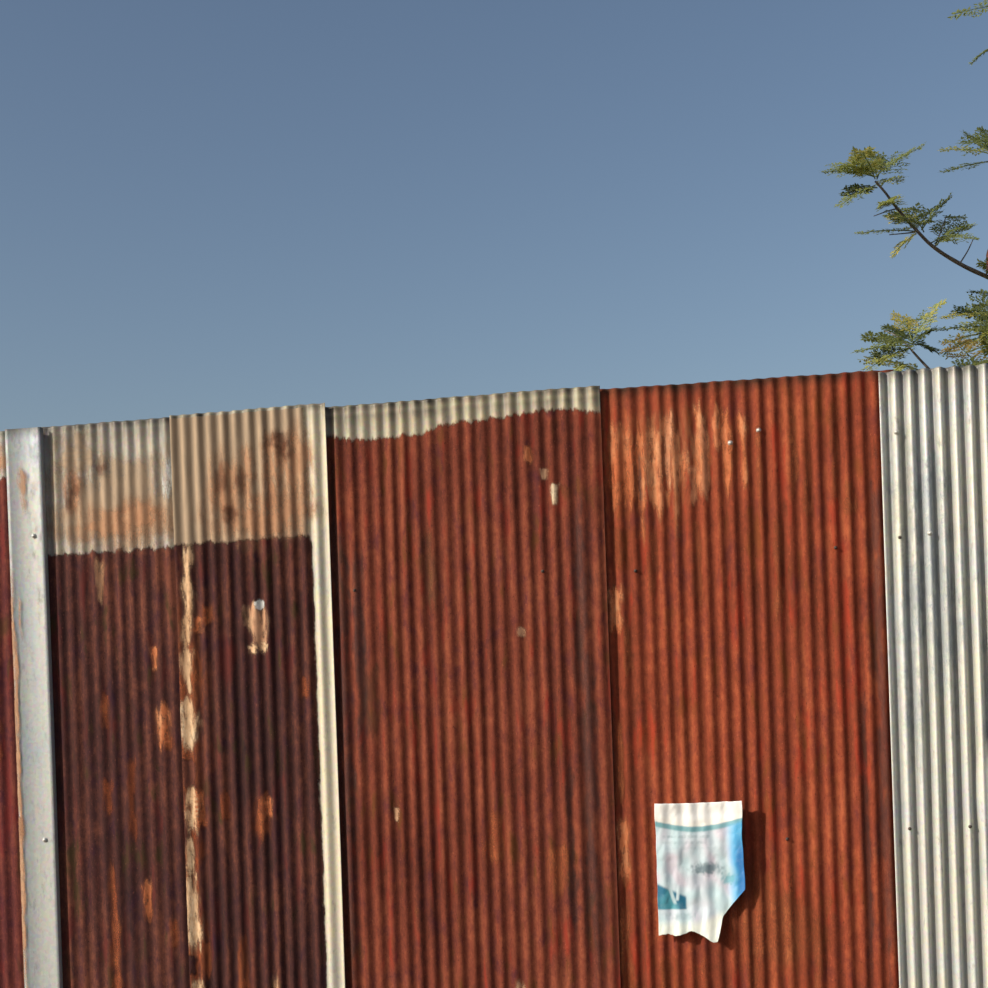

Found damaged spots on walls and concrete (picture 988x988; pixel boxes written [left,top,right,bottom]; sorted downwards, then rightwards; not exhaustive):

corrosion [789,410,813,559]
corrosion [829,406,857,513]
corrosion [0,447,26,988]
corrosion [48,404,763,988]
corrosion [732,868,823,988]